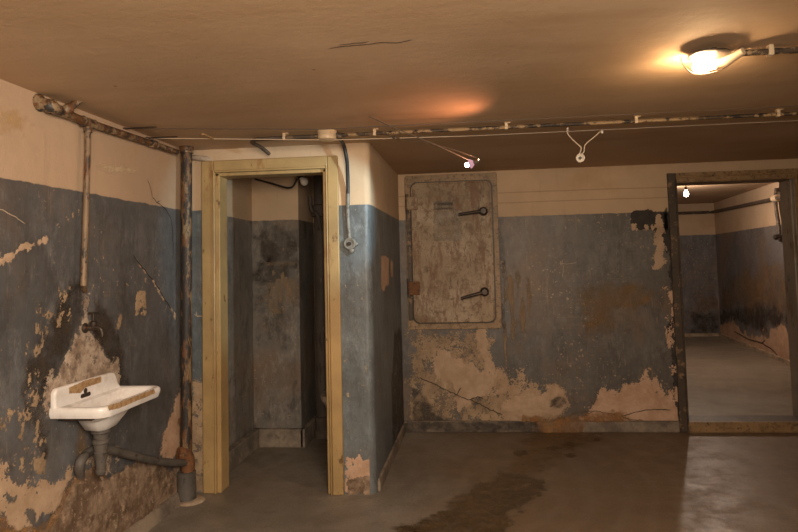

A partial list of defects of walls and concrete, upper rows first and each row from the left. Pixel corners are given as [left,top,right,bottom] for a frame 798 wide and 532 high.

peeling [631,214,668,270]
leakage [630,208,672,289]
crack [134,256,200,320]
peeling [662,281,675,349]
crack [734,331,777,355]
spalling [0,285,181,532]
crack [419,377,503,415]
peeling [404,329,541,421]
peeling [576,368,678,421]
peeling [345,449,370,495]
leakage [395,474,547,532]